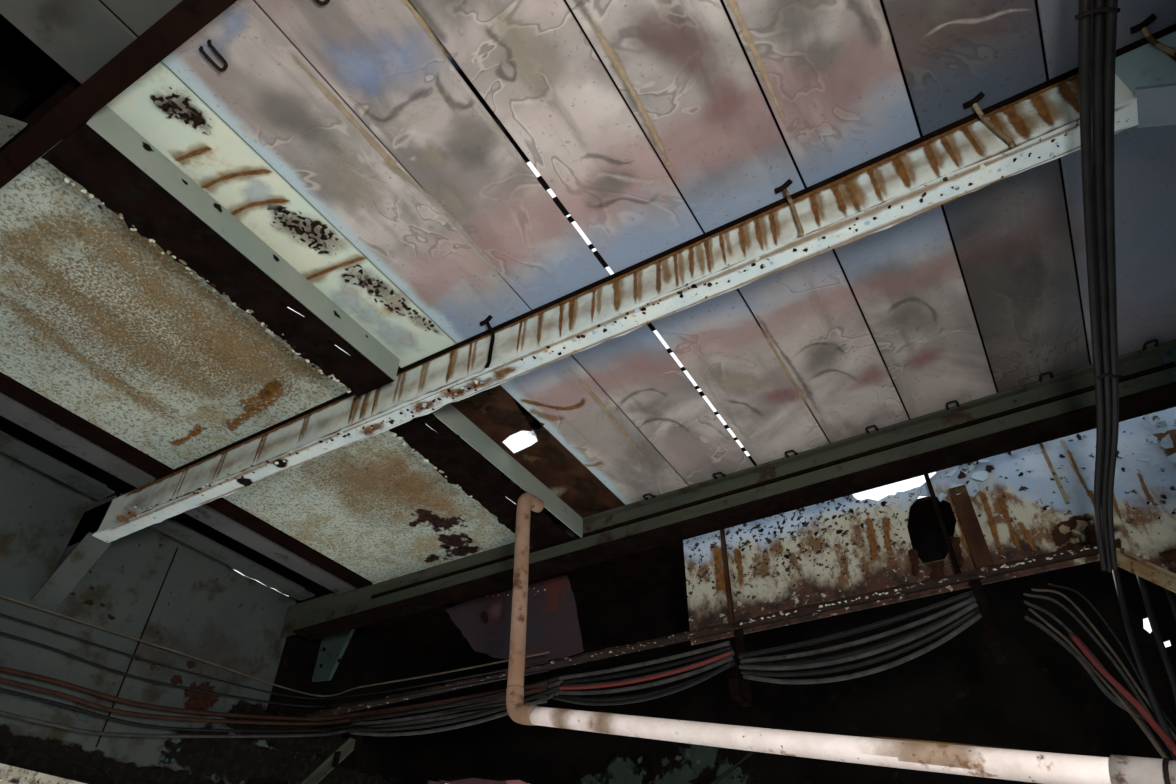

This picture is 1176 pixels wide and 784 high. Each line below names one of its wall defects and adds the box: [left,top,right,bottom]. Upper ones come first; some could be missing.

leakage [294,56,462,224]
corrosion [0,210,323,430]
corrosion [112,73,1098,563]
corrosion [1152,429,1176,456]
corrosion [1138,473,1155,506]
corrosion [712,547,744,591]
corrosion [908,508,972,578]
corrosion [1159,549,1176,574]